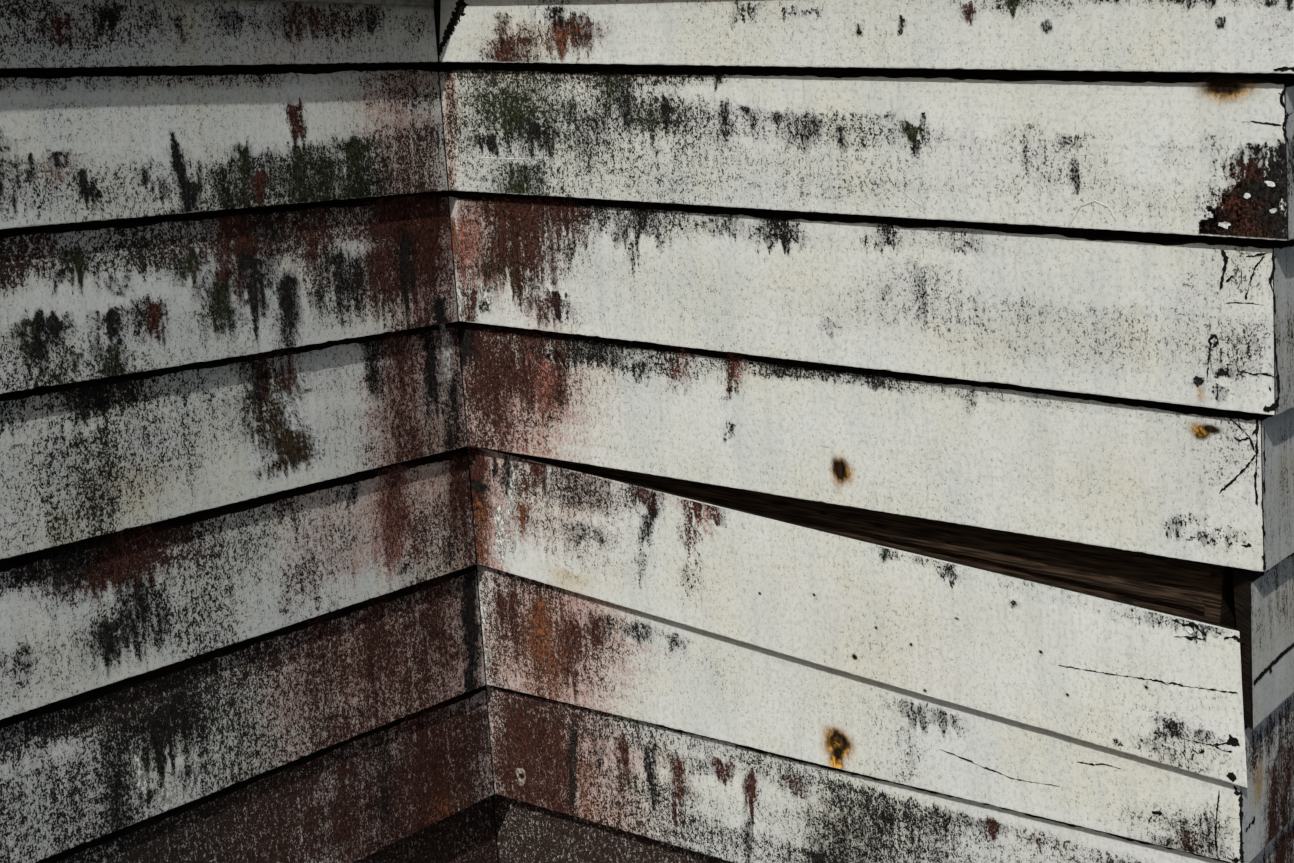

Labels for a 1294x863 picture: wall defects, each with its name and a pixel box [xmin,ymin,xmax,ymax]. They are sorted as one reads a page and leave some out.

rust [476,6,612,62]
water stain [714,66,849,153]
water stain [875,112,934,158]
rust [451,217,489,322]
water stain [0,64,710,863]
rust [833,460,850,481]
crack [1058,250,1294,754]
rust [1193,425,1220,439]
rust [826,730,851,769]
water stain [777,772,1050,863]
crack [1214,786,1245,863]
rust [1261,737,1294,845]